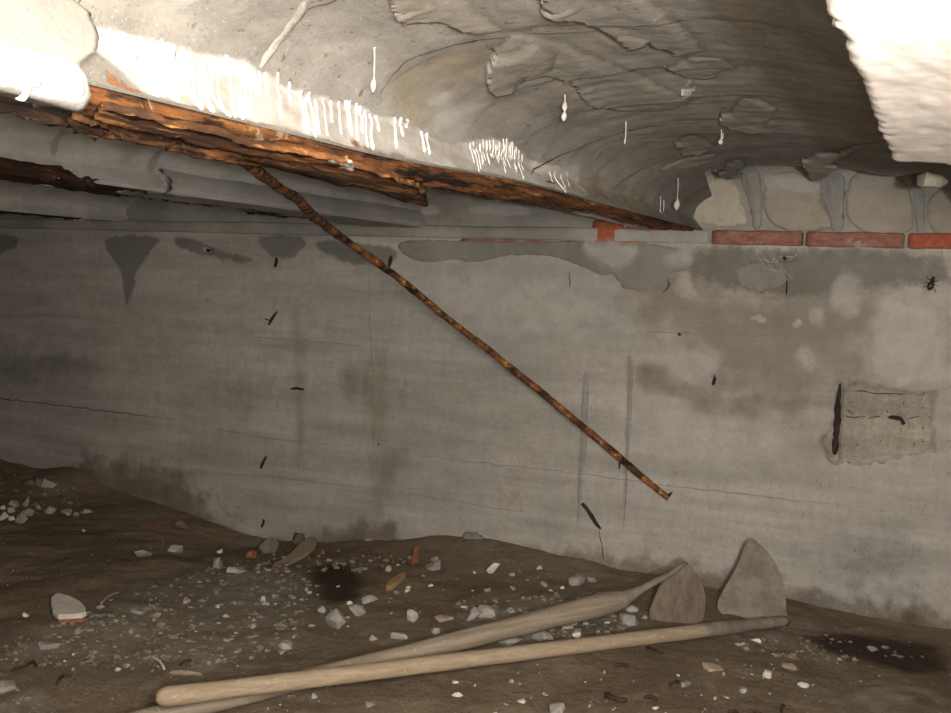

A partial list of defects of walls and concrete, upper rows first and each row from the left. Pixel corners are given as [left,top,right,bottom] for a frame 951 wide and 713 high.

water stain [0,41,88,102]
crack [380,38,504,100]
corrosion [65,113,111,141]
corrosion [328,159,354,172]
water stain [96,26,667,218]
crack [531,123,692,188]
peeling [802,144,880,181]
water stain [106,236,158,302]
water stain [176,239,249,261]
corrosion [236,163,672,500]
corrosion [832,383,841,455]
spalling [820,382,935,466]